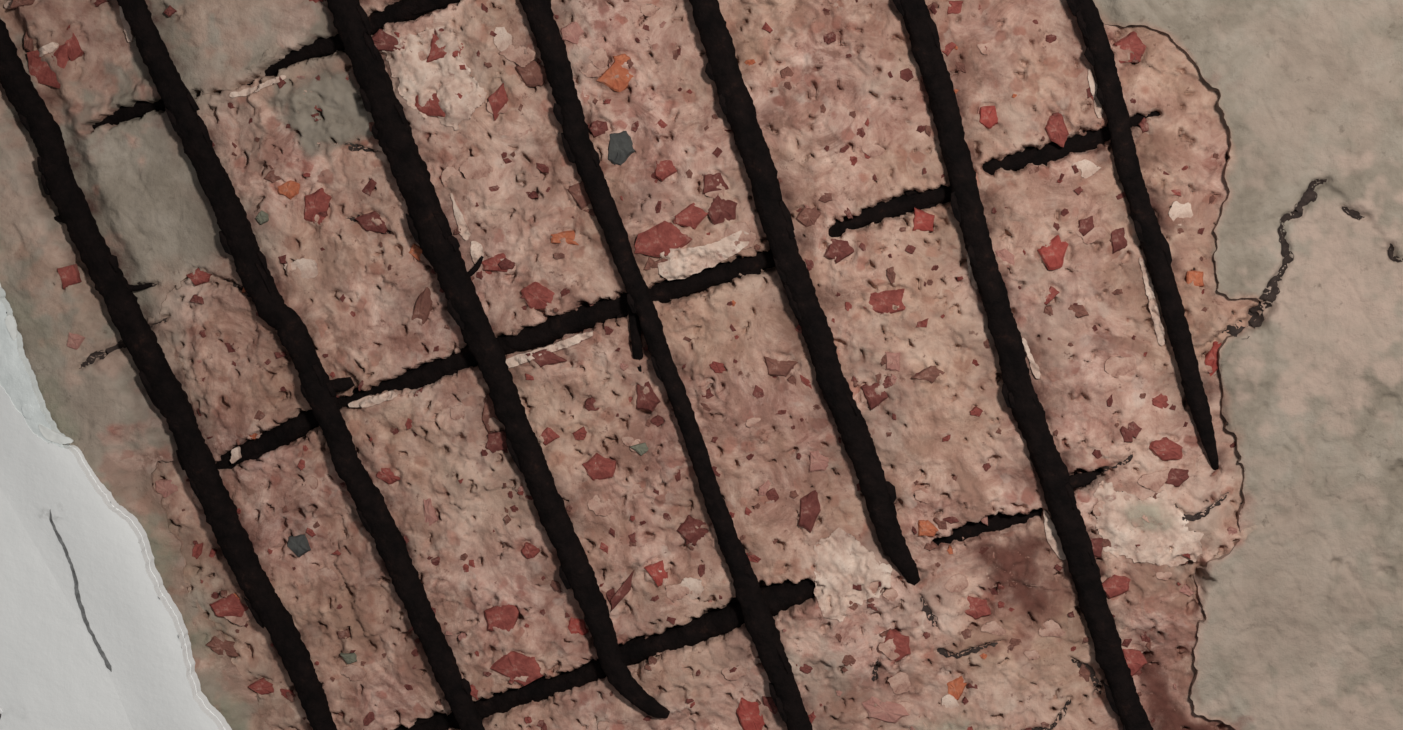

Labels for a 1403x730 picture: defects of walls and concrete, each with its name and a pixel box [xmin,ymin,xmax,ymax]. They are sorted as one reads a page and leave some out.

corrosion [928,16,940,47]
corrosion [187,91,210,145]
corrosion [780,199,795,239]
corrosion [1133,219,1172,267]
crack [1222,179,1364,339]
crack [1388,243,1403,262]
spalling [0,0,461,730]
spalling [145,0,788,730]
spalling [551,0,1123,730]
spalling [925,0,1403,730]
corrosion [885,481,897,504]
corrosion [1143,650,1222,730]